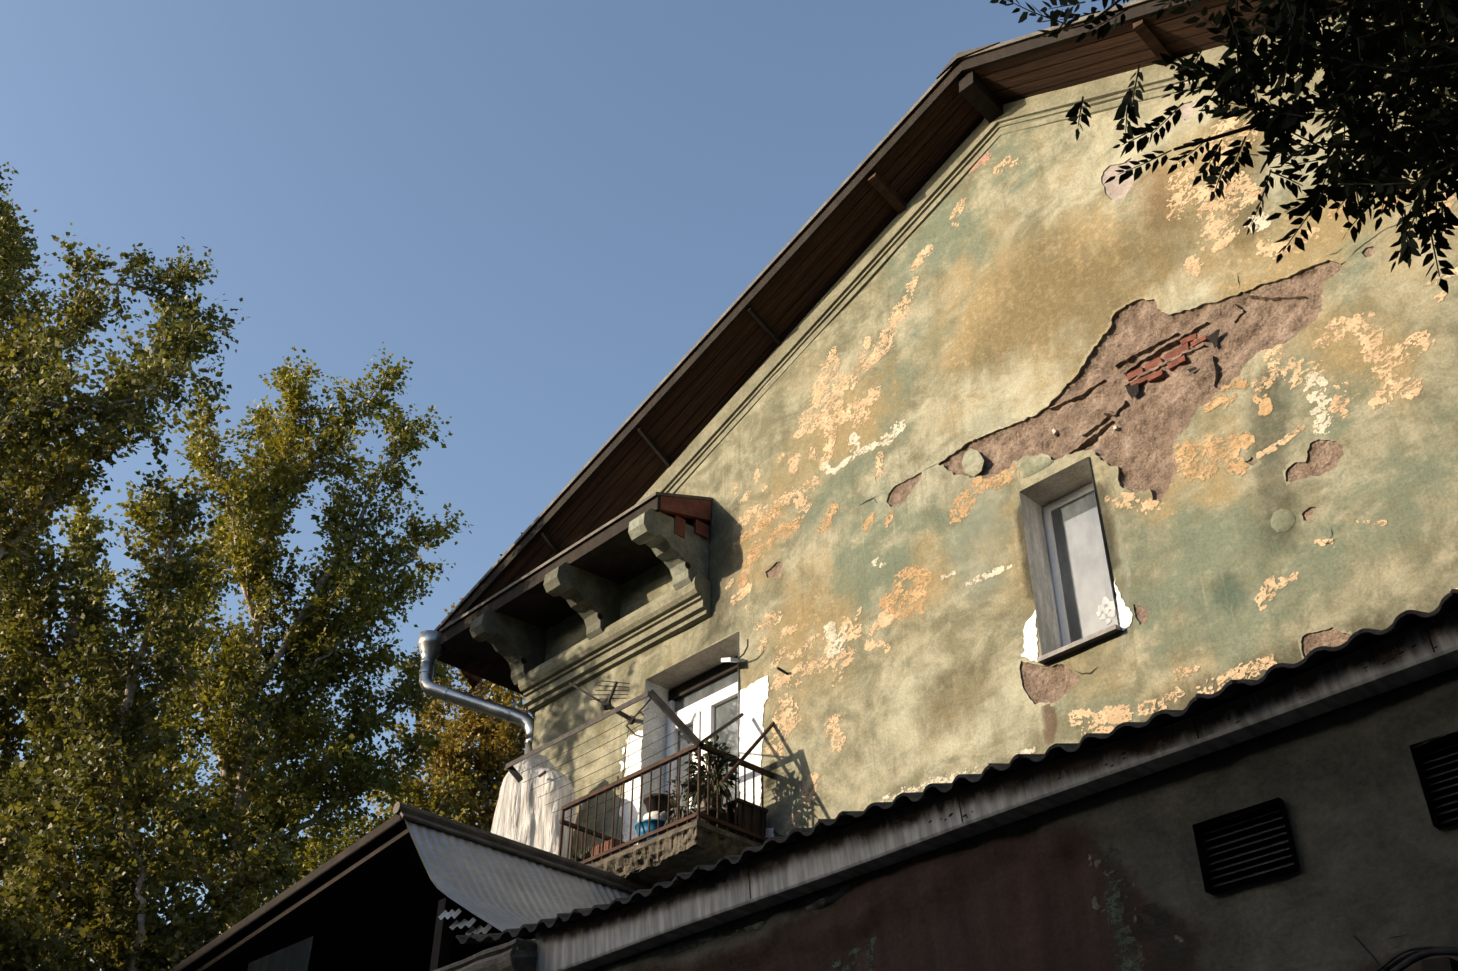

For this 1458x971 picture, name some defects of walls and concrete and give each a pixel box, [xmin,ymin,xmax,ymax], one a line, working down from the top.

peeling [949,198,966,227]
peeling [969,151,1023,174]
peeling [1165,117,1345,276]
spalling [938,246,1436,525]
peeling [725,244,1013,758]
spalling [1301,627,1351,658]
peeling [1019,654,1277,735]
peeling [769,772,820,837]